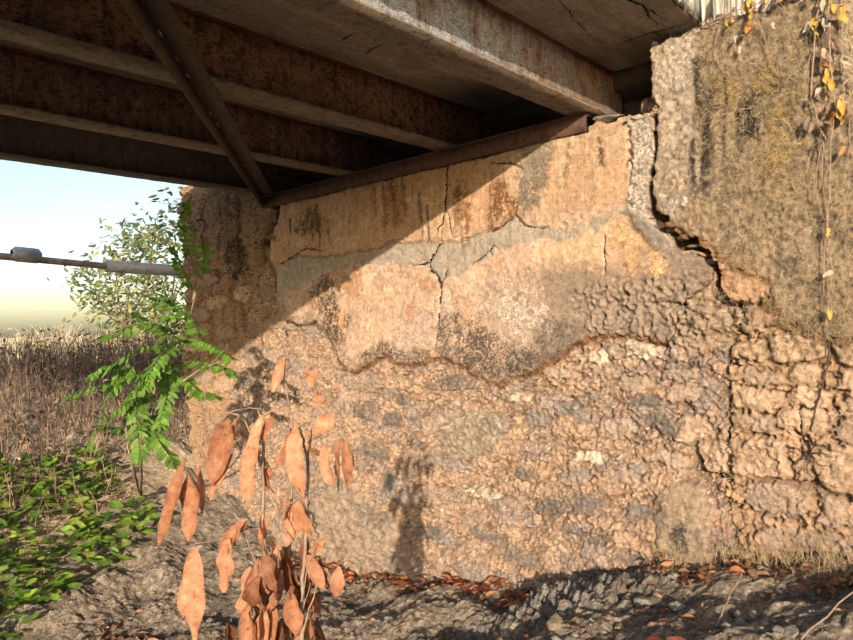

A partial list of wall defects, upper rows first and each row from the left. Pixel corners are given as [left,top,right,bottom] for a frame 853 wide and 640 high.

crack [558,0,683,45]
peeling [652,38,696,92]
crack [237,204,323,332]
leakage [289,204,330,241]
leakage [412,185,430,241]
crack [413,165,453,353]
crack [476,205,550,262]
spalling [622,114,853,347]
flaking render [284,316,669,389]
crack [652,189,763,501]